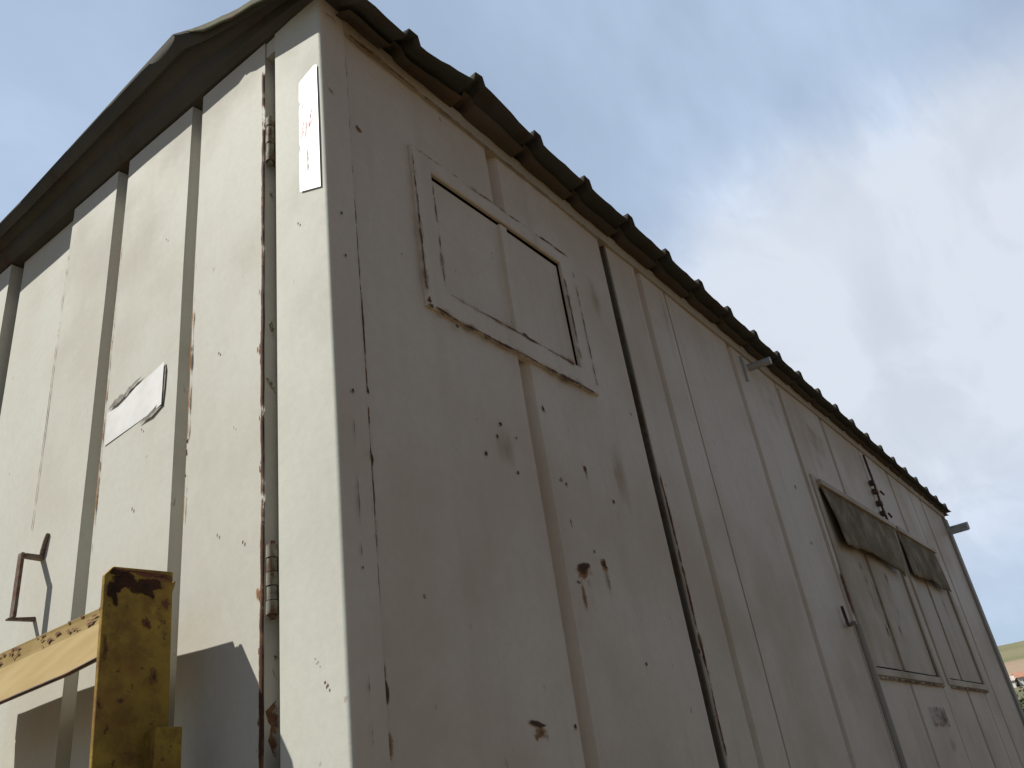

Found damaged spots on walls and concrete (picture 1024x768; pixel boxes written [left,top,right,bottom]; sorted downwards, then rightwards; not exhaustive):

corrosion [256,73,278,768]
corrosion [577,550,610,607]
corrosion [530,720,547,740]